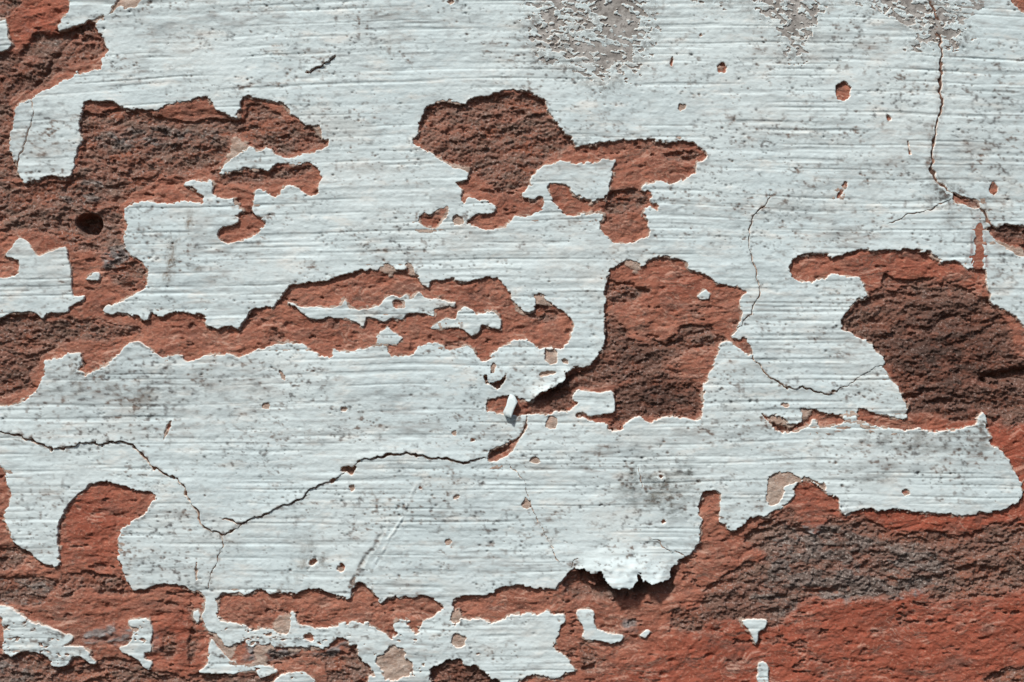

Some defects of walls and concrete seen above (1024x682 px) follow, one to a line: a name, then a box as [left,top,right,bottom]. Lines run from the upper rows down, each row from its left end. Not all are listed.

peeling [753,0,827,65]
crack [929,0,954,211]
peeling [0,0,752,469]
crack [4,432,476,536]
peeling [0,181,1024,682]